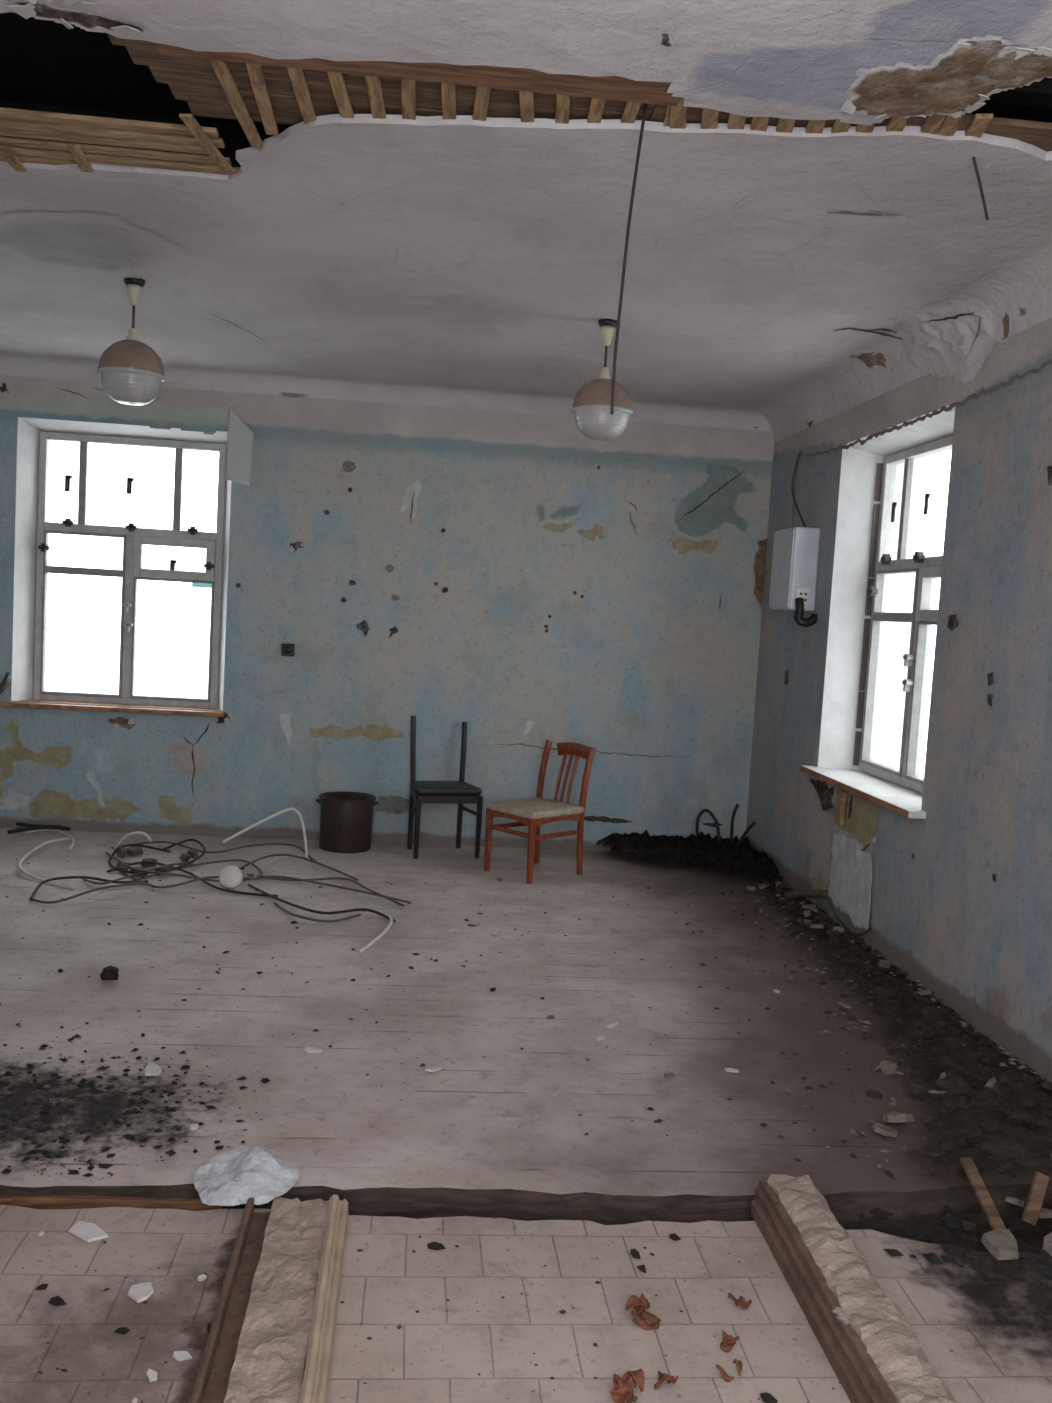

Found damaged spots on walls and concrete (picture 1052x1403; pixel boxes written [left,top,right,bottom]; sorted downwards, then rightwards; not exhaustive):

crack [6,0,144,36]
spalling [840,35,1052,120]
peeling [662,459,767,613]
peeling [0,714,198,827]
peeling [307,721,408,744]